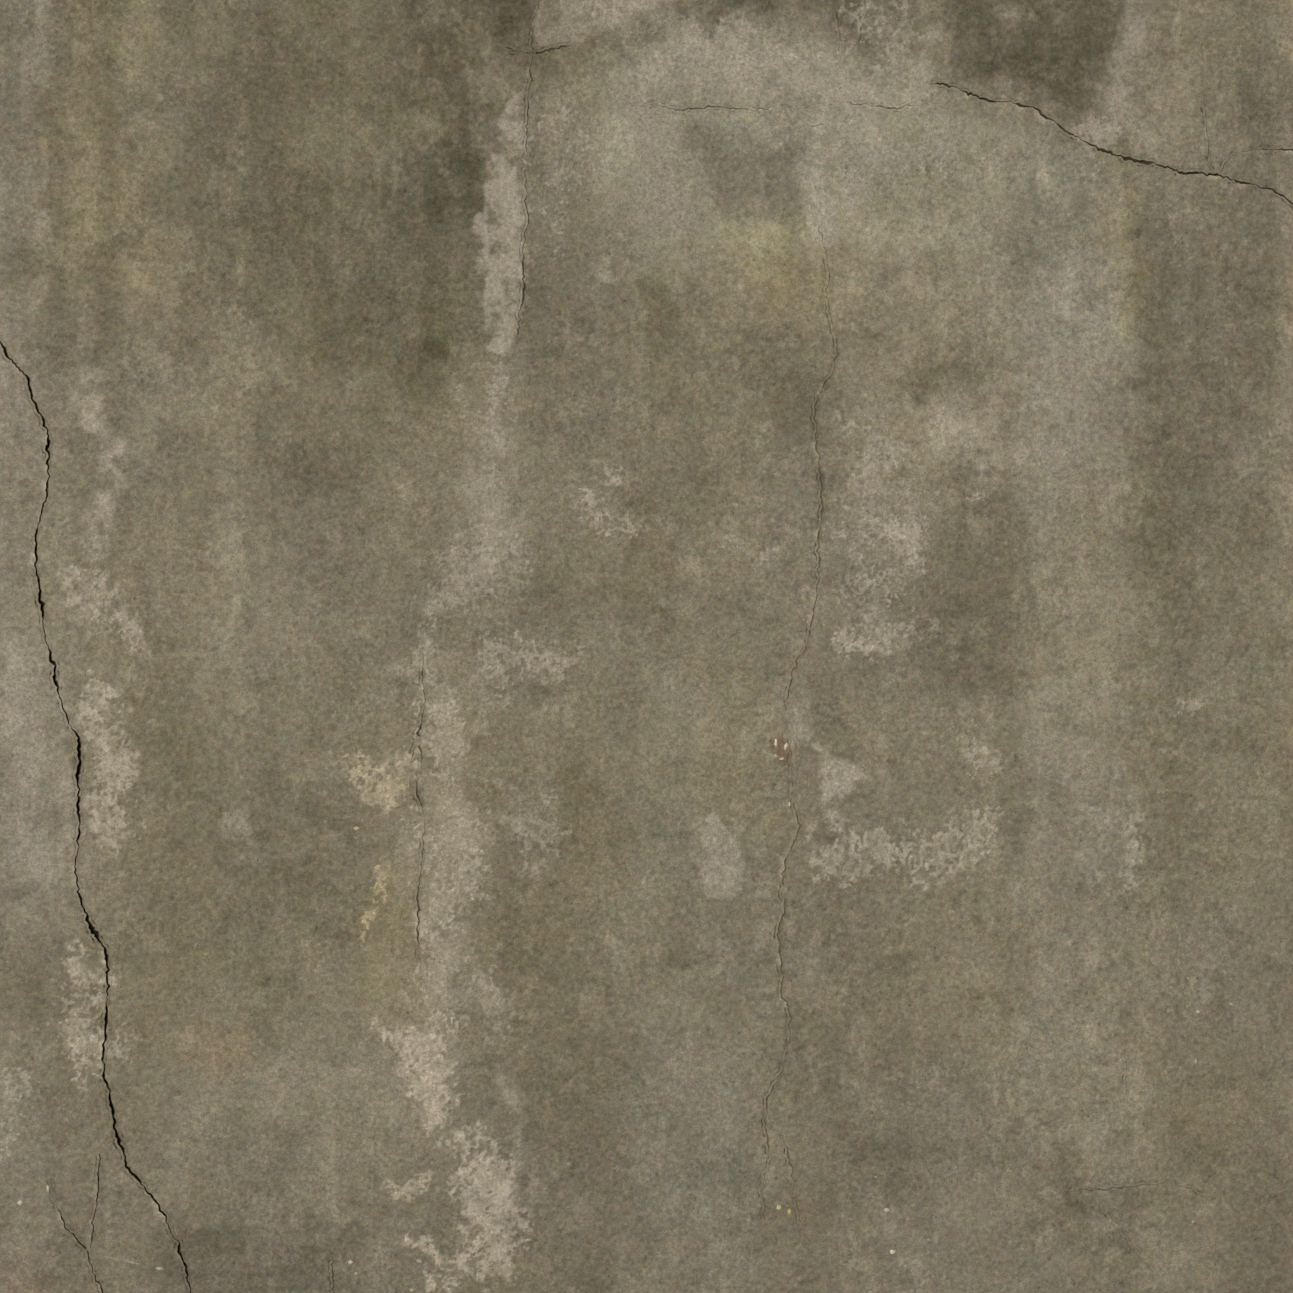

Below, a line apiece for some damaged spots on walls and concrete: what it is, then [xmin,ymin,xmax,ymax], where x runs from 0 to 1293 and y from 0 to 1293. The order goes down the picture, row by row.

damp [379,0,532,256]
crack [503,0,576,338]
damp [673,0,833,50]
crack [622,79,1293,207]
damp [936,0,1121,135]
crack [0,336,194,1293]
crack [407,650,428,969]
efflorescence [319,320,600,1293]
crack [759,195,841,1226]